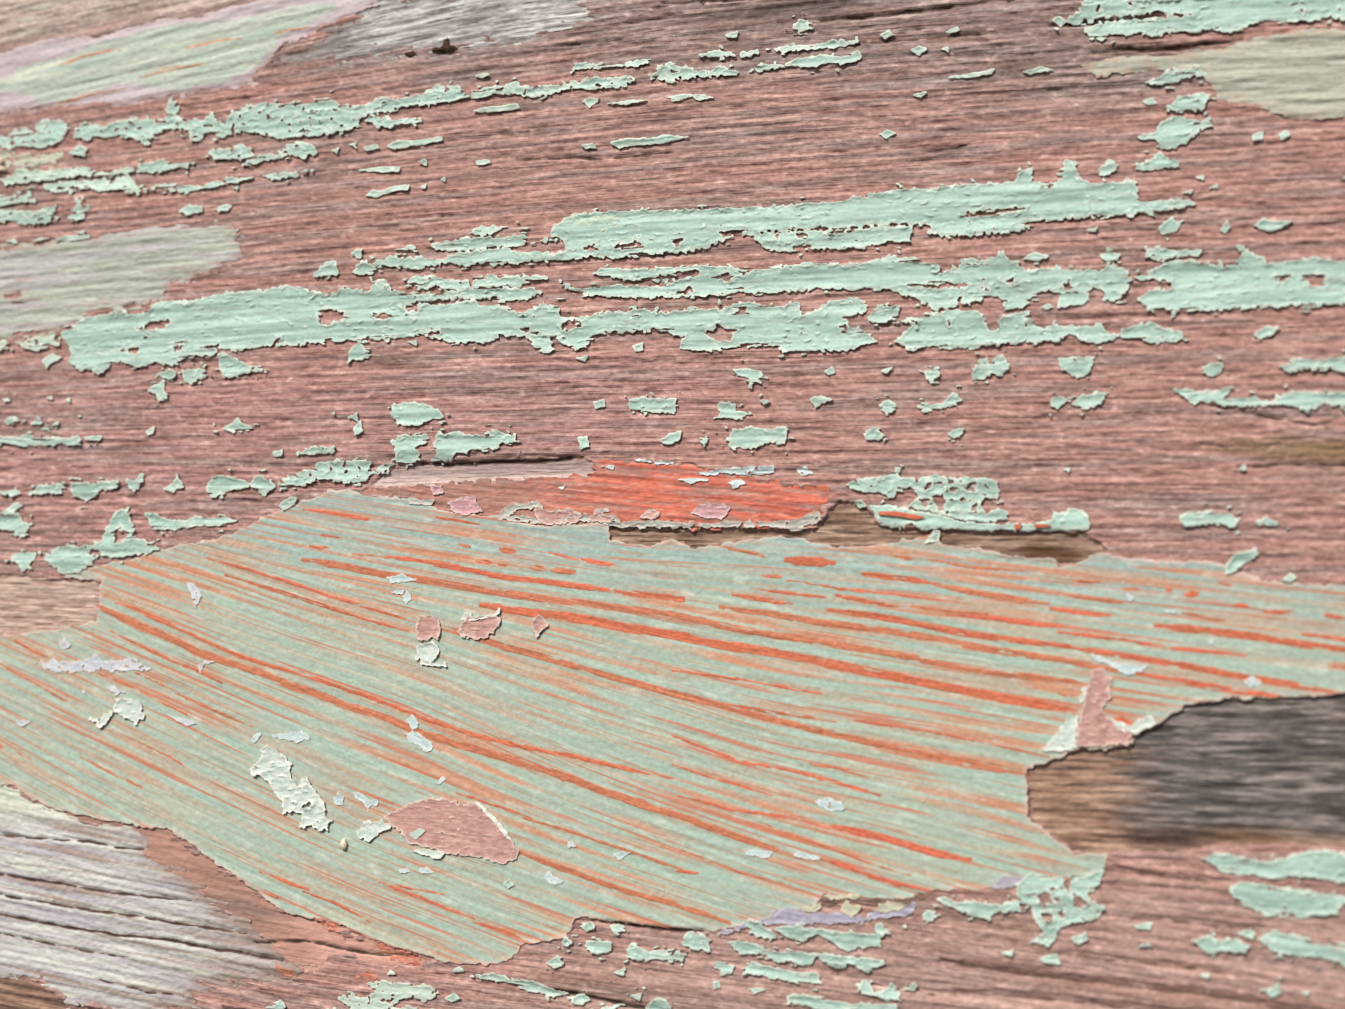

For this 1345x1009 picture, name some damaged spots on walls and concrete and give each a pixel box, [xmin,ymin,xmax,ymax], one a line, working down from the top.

peeling [1052,0,1345,44]
peeling [0,12,862,244]
peeling [0,64,1345,489]
peeling [0,401,521,728]
spalling [408,464,1106,564]
peeling [1179,502,1289,535]
peeling [1225,547,1259,575]
peeling [250,731,520,889]
peeling [405,714,433,752]
peeling [1027,654,1345,979]
peeling [0,784,317,1009]
peeling [452,870,1105,1009]